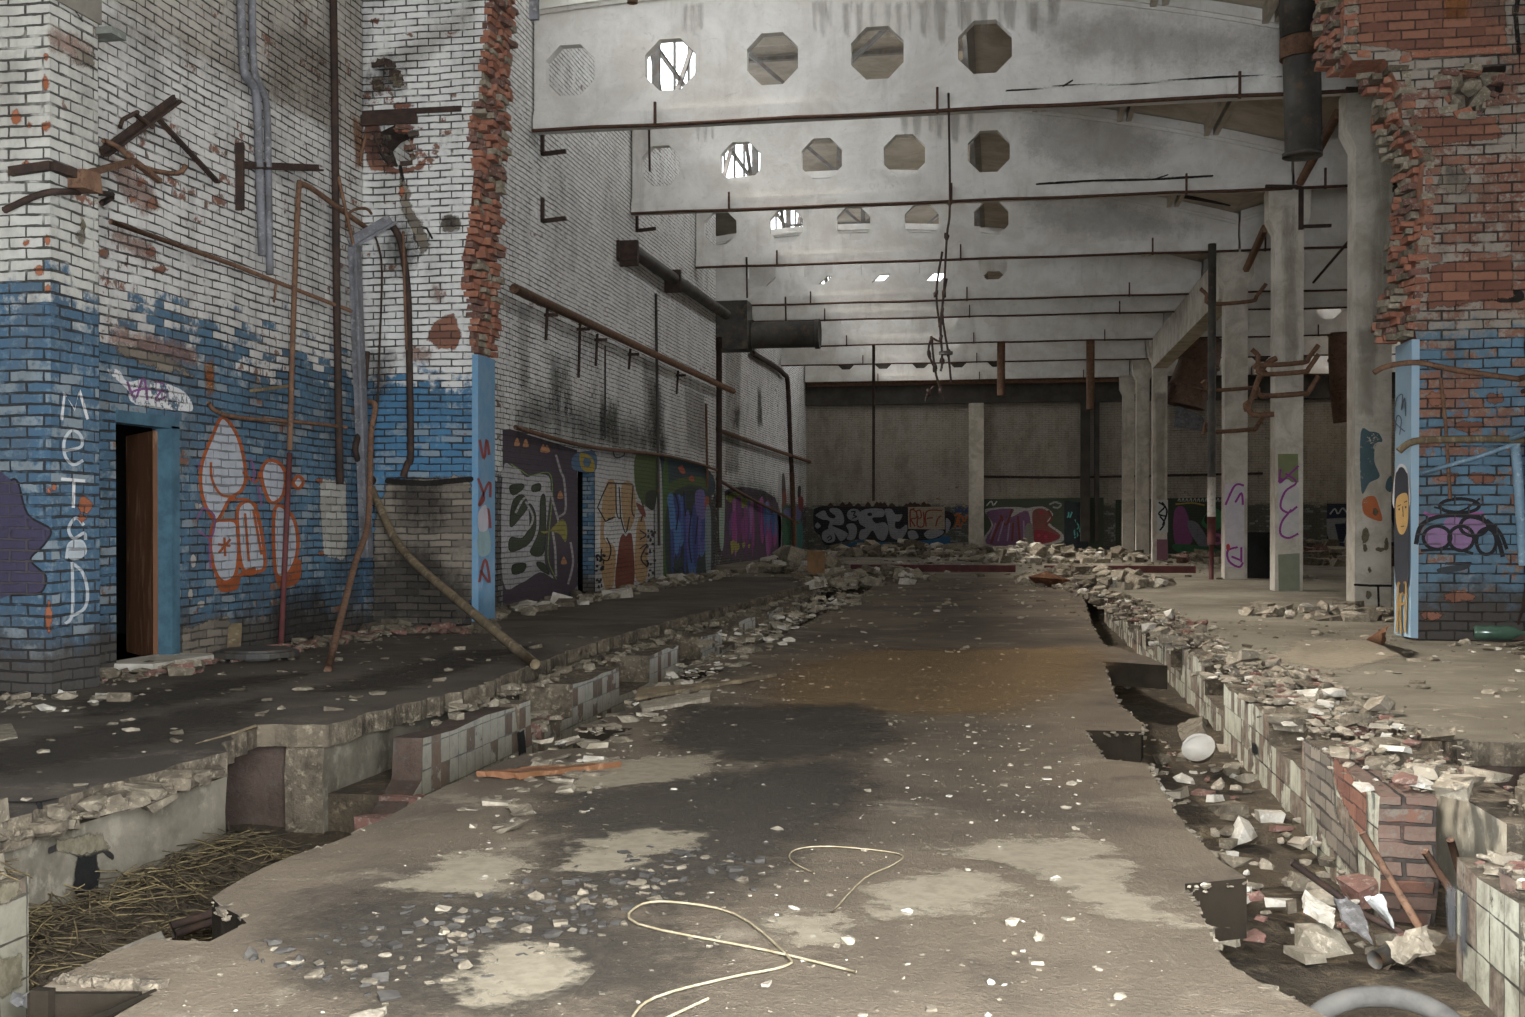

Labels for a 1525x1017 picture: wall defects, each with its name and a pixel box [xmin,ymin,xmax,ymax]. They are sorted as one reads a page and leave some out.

peeling [10,109,51,131]
spalling [363,58,426,175]
spalling [413,0,519,361]
spalling [1310,0,1524,344]
peeling [34,265,51,292]
peeling [110,330,214,383]
peeling [1438,472,1495,484]
leakage [284,648,1085,1015]